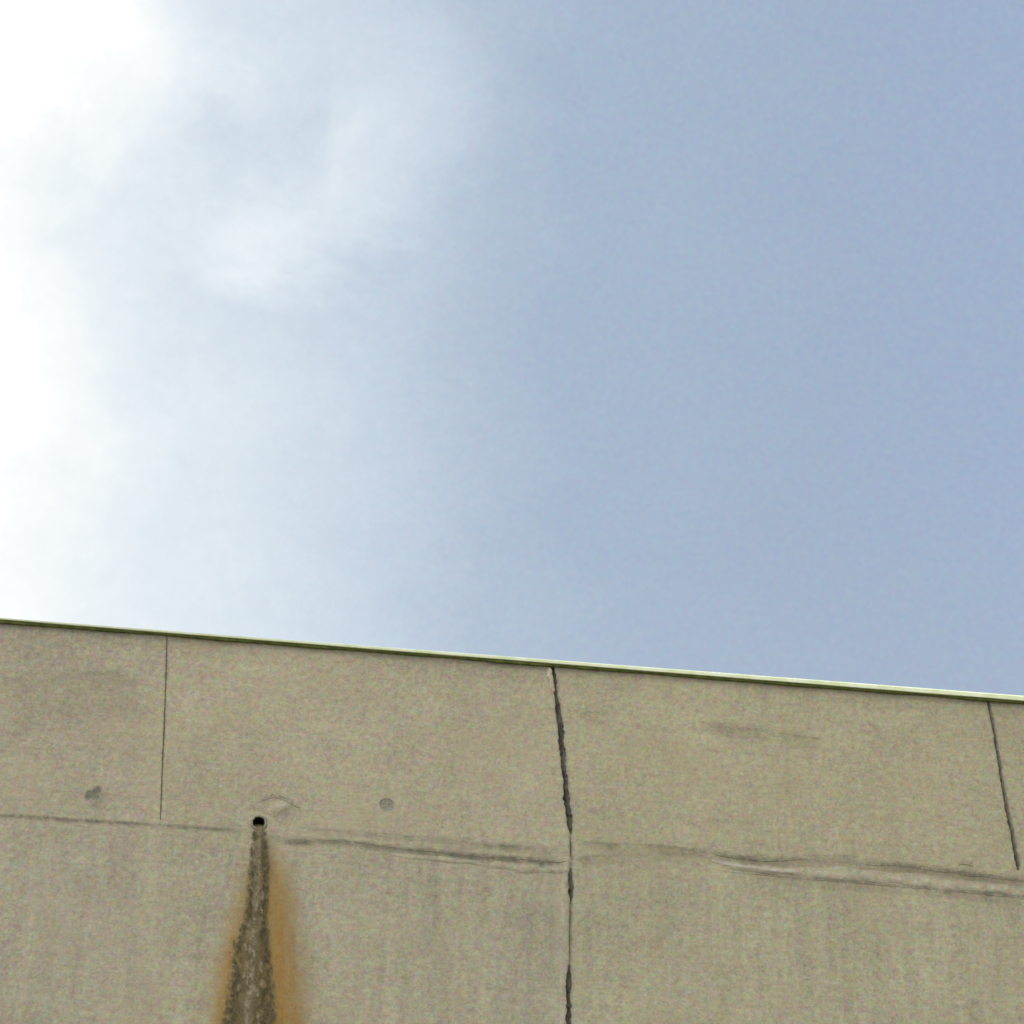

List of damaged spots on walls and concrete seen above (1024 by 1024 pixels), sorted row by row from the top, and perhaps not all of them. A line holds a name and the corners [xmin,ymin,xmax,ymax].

damp [223,826,275,1024]
crack [278,667,616,1024]
crack [650,702,1024,897]